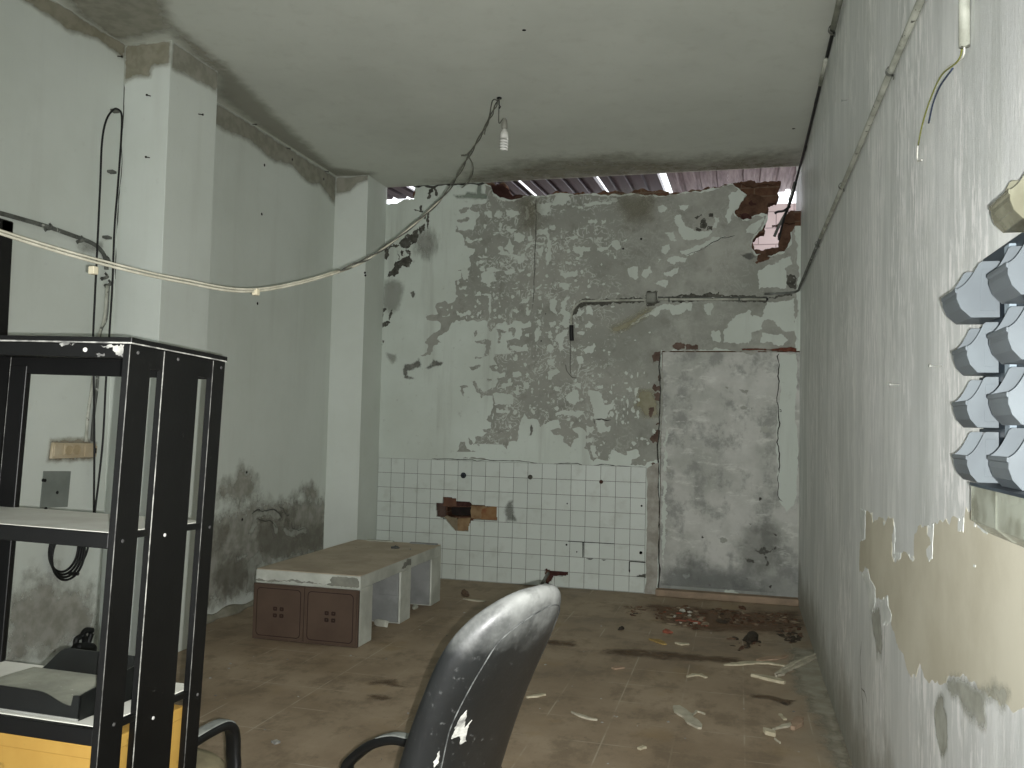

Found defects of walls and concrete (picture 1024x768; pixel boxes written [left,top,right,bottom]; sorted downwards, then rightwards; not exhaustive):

damp [25,0,218,90]
damp [216,104,368,202]
flaking render [384,188,438,277]
peeling [421,180,800,579]
damp [208,470,325,606]
damp [6,584,93,661]
peeling [859,508,1024,713]